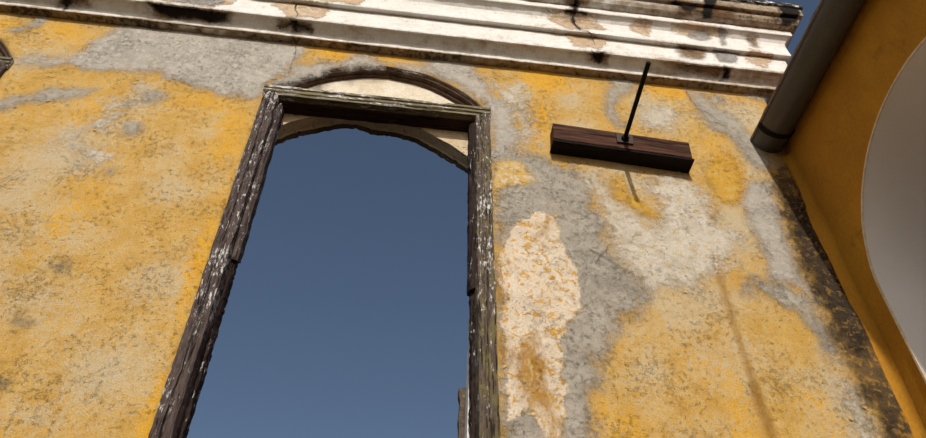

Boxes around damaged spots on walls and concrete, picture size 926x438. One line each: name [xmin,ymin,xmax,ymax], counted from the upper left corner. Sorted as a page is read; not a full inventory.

water stain [148,2,229,23]
water stain [564,0,590,30]
water stain [671,0,737,81]
peeling [493,82,538,143]
peeling [640,104,677,130]
peeling [579,170,743,294]
spalling [497,211,583,438]
water stain [772,167,913,438]